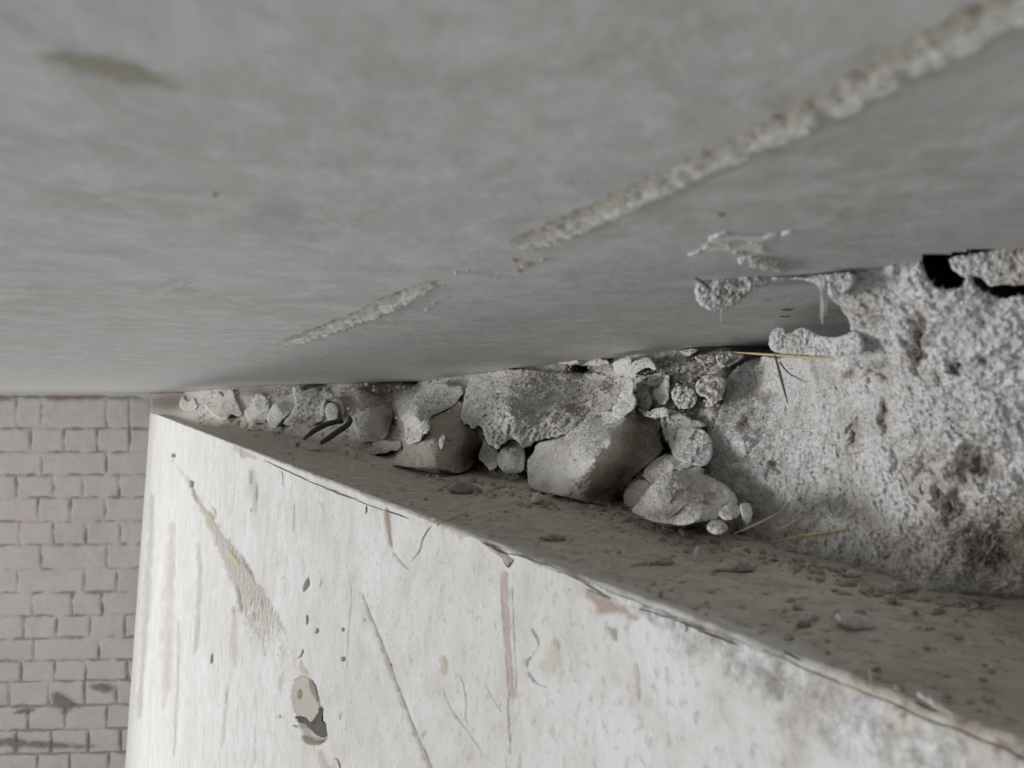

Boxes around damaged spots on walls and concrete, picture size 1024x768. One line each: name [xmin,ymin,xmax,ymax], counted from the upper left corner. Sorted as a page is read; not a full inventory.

damp [53,56,159,83]
peeling [484,542,514,566]
spalling [291,649,340,768]
rust [500,573,516,753]